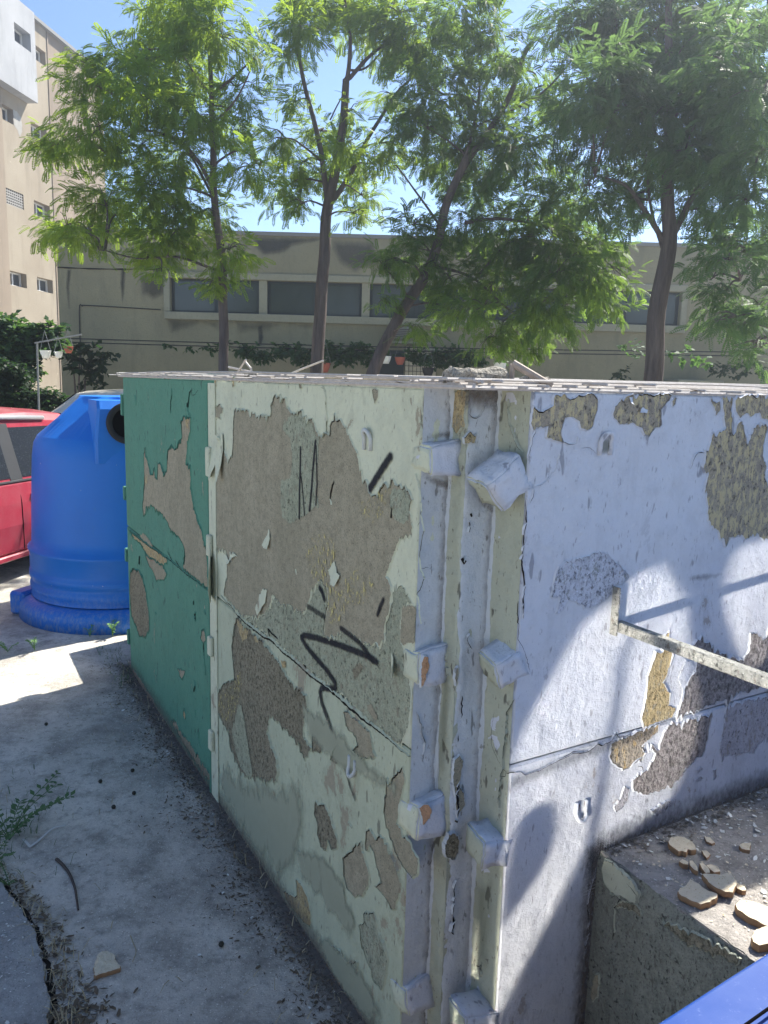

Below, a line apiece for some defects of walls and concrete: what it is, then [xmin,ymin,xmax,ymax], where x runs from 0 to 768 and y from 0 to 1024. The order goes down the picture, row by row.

peeling [529,392,598,443]
peeling [612,392,677,438]
peeling [701,394,768,548]
peeling [129,530,168,639]
peeling [142,394,430,786]
peeling [691,627,768,673]
peeling [608,648,768,817]
peeling [283,879,312,929]
peeling [314,767,420,991]